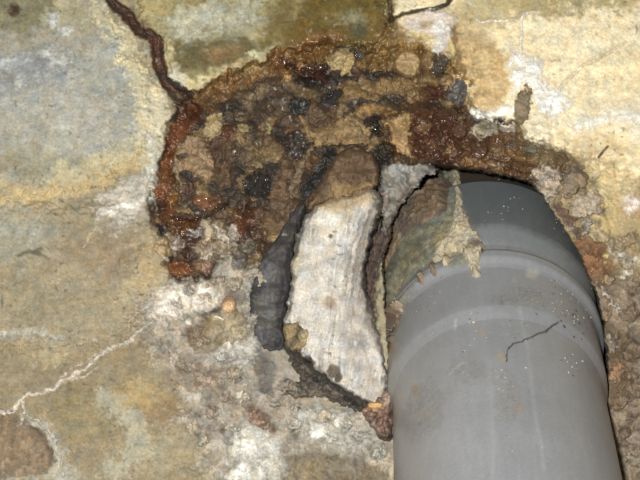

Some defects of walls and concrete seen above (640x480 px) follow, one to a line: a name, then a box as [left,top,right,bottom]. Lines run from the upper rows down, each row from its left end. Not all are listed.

peeling [167,0,257,43]
crack [380,0,451,35]
crack [107,0,215,124]
corrosion [152,28,339,238]
efflorescence [146,278,222,325]
spalling [148,42,640,433]
corrosion [575,232,615,307]
crack [0,304,158,425]
leakage [214,334,274,393]
corrosion [603,328,634,397]
spalling [604,330,640,467]
leakage [221,404,388,480]